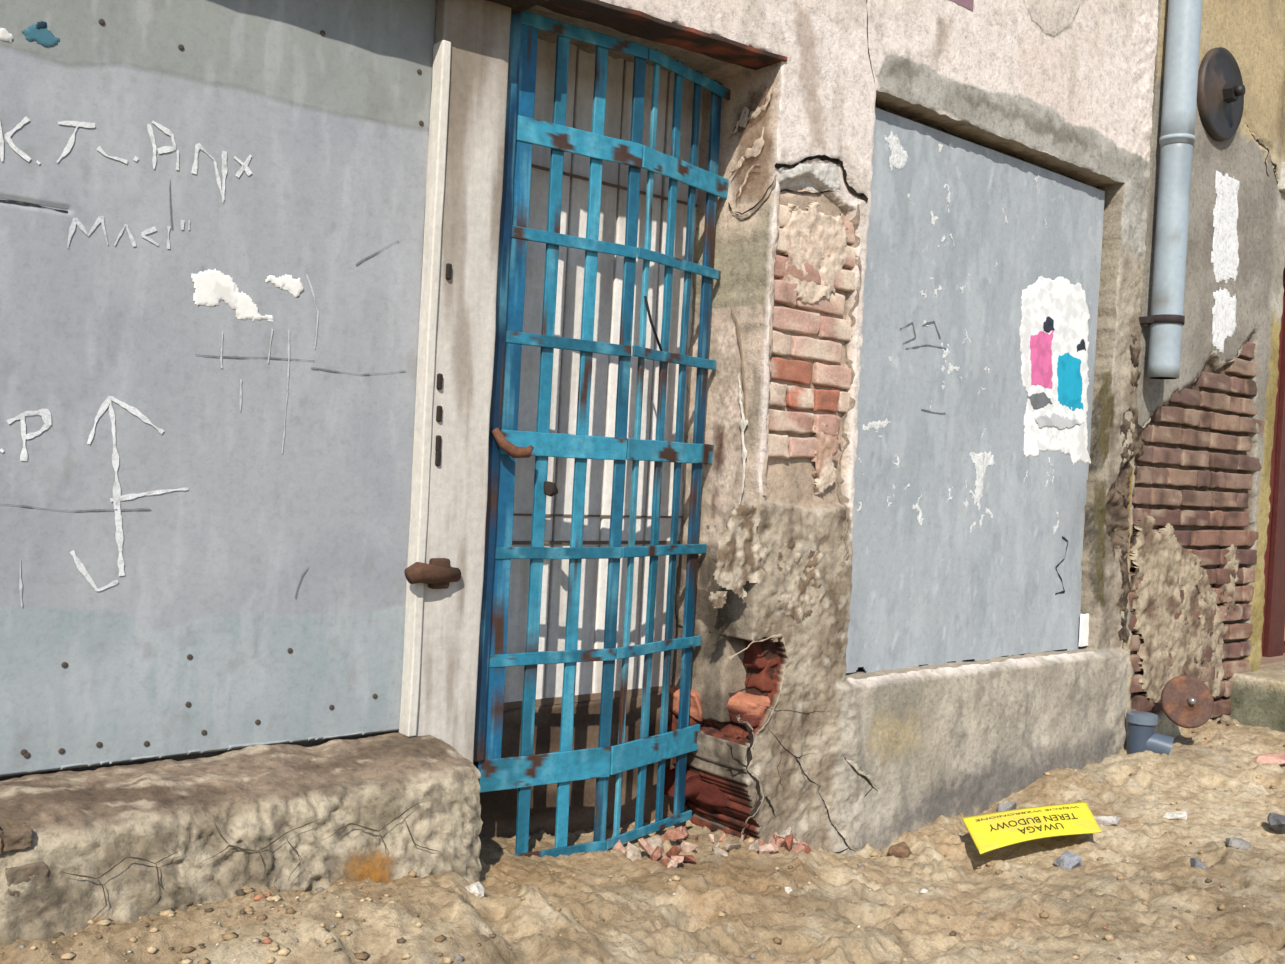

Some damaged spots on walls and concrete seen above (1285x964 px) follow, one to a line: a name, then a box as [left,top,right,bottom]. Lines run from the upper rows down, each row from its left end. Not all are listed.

peeling [884,131,908,171]
peeling [930,184,954,247]
flaking render [708,87,868,625]
peeling [941,329,971,389]
peeling [862,418,891,437]
peeling [887,484,924,525]
peeling [946,432,995,533]
flaking render [1114,330,1265,718]
spalling [667,634,788,740]
spalling [664,757,731,807]
crack [726,703,856,854]
crack [844,756,879,797]